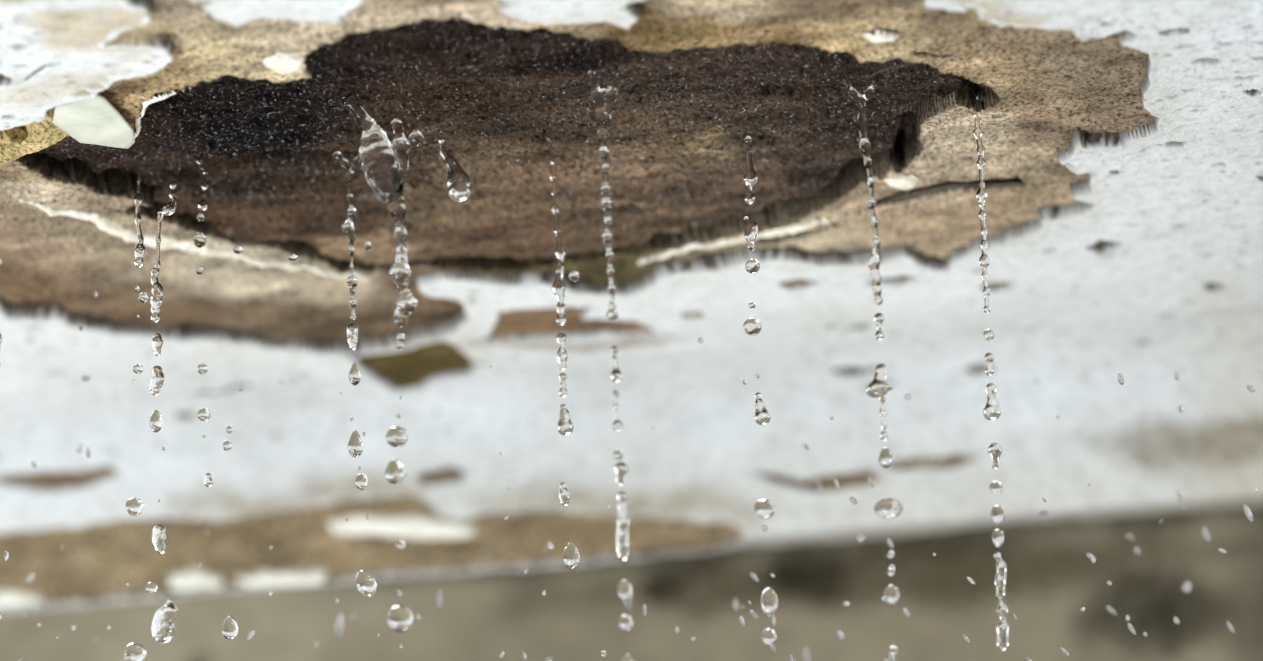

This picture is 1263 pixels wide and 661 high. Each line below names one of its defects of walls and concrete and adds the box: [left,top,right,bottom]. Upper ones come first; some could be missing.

flaking render [0,0,1155,343]
flaking render [358,341,473,390]